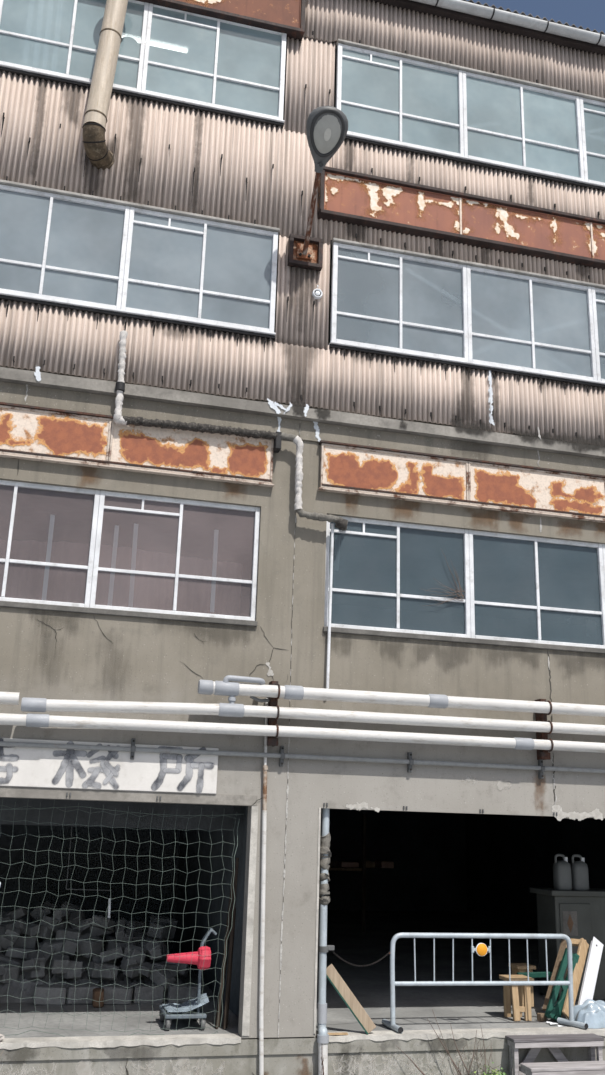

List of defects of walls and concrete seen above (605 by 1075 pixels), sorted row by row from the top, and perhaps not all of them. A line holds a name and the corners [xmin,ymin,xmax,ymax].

rust [0,413,268,477]
rust [326,452,605,515]
crack [251,517,297,1038]
spalling [552,804,603,821]